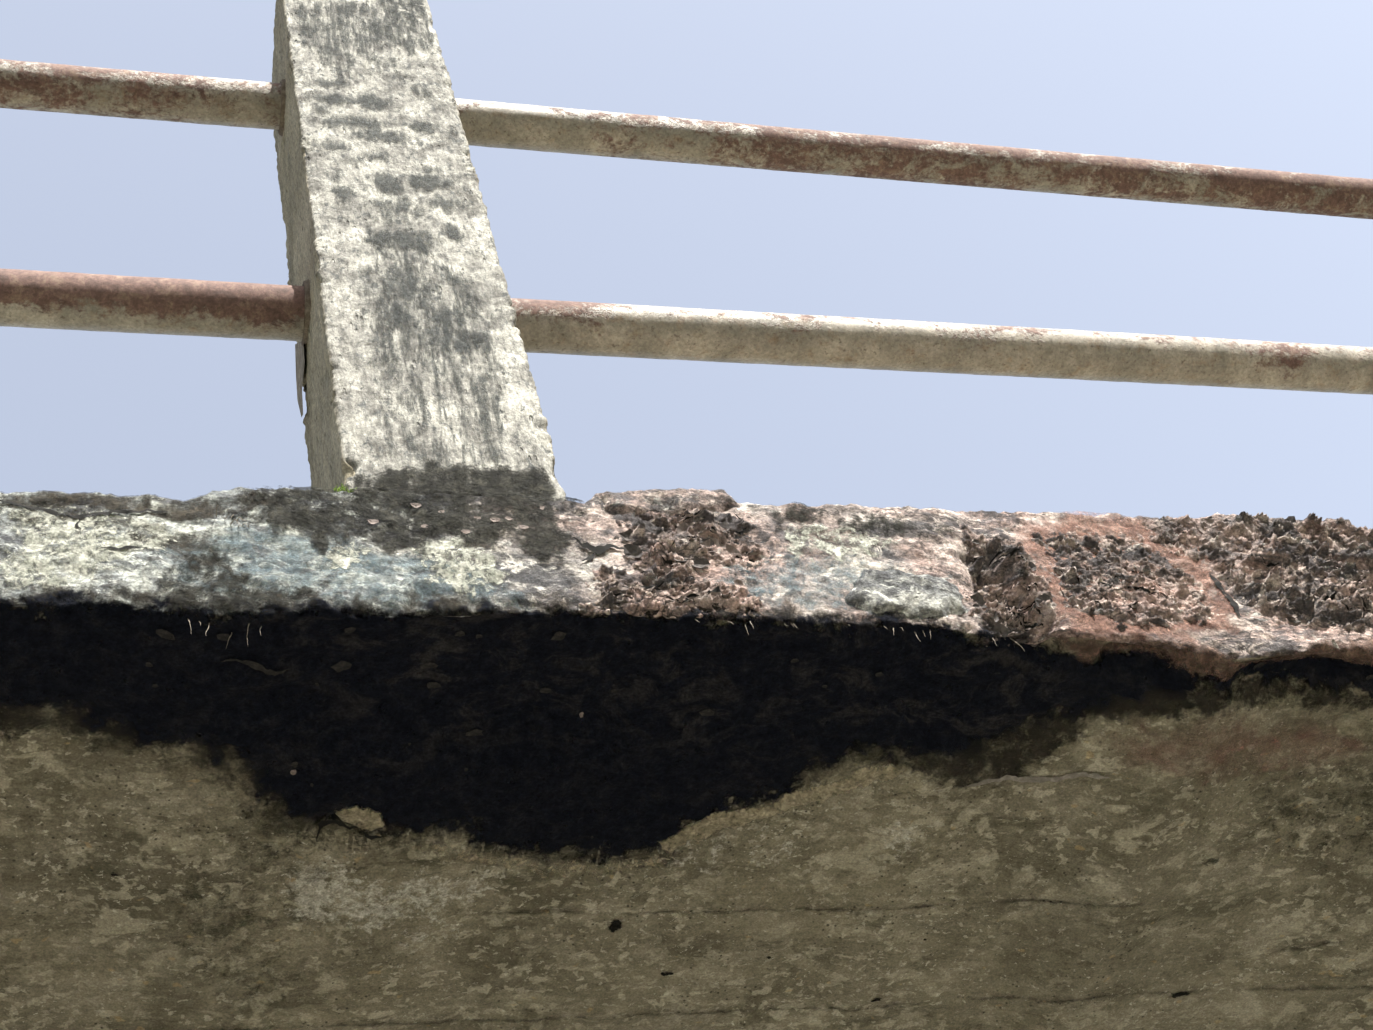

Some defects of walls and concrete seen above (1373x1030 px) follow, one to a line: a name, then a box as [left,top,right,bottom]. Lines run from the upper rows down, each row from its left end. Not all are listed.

leakage [0,588,1373,998]